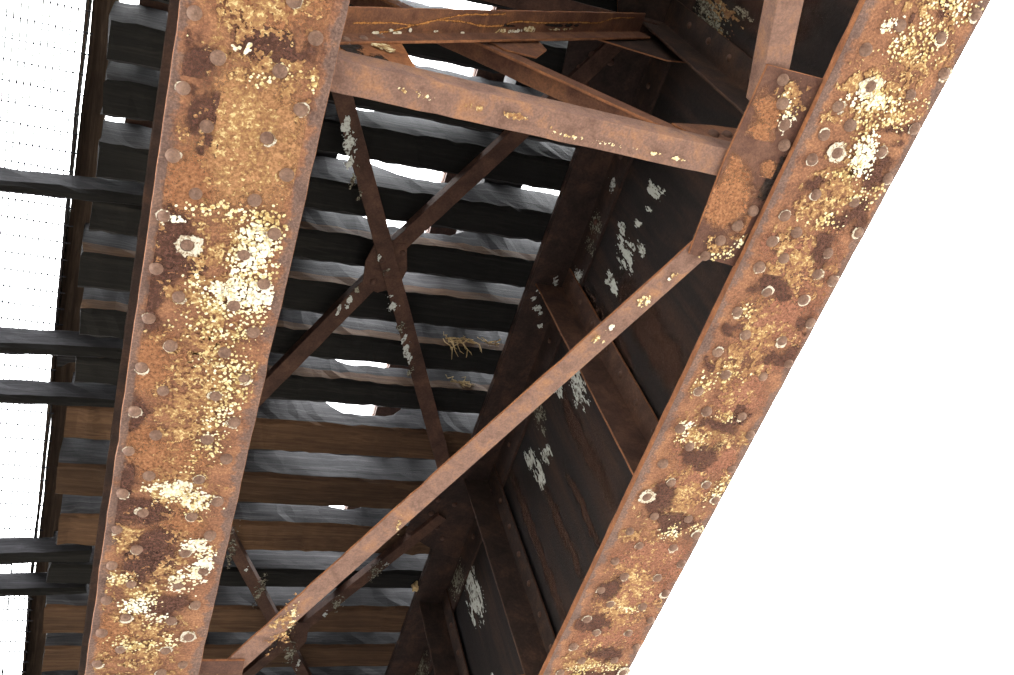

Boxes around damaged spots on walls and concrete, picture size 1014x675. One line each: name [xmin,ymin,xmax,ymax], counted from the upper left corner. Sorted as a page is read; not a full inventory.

corrosion [735,0,764,30]
corrosion [162,61,306,228]
peeling [504,111,528,121]
corrosion [702,152,777,236]
peeling [93,0,324,675]
corrosion [613,307,685,387]
peeling [554,0,984,675]
corrosion [710,231,844,421]
corrosion [123,420,217,482]
peeling [524,405,553,490]
corrosion [566,475,692,650]
corrosion [97,614,134,661]